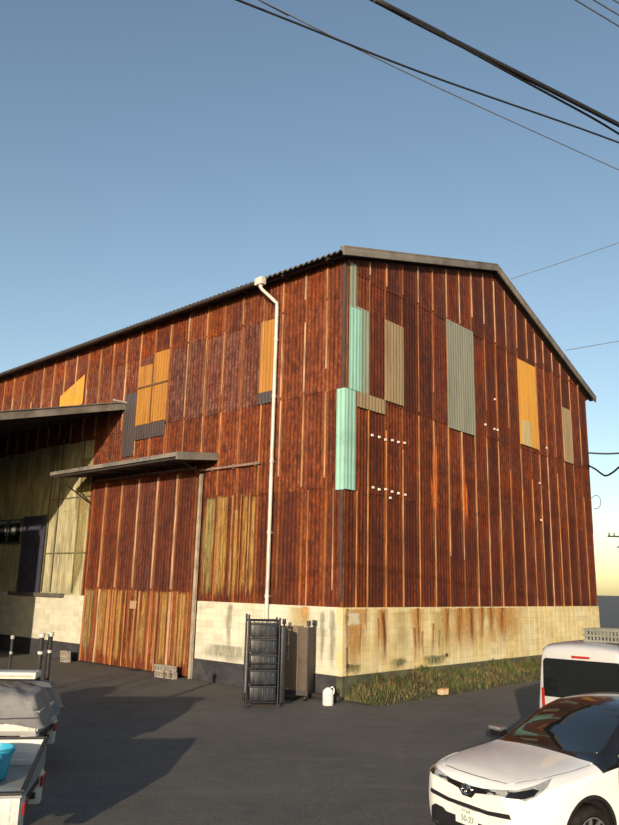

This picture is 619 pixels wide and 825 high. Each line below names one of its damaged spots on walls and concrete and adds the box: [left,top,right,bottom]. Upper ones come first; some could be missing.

corrosion [460,456,468,522]
corrosion [346,609,366,670]
corrosion [378,609,386,642]
corrosion [398,608,423,645]
corrosion [433,607,513,642]